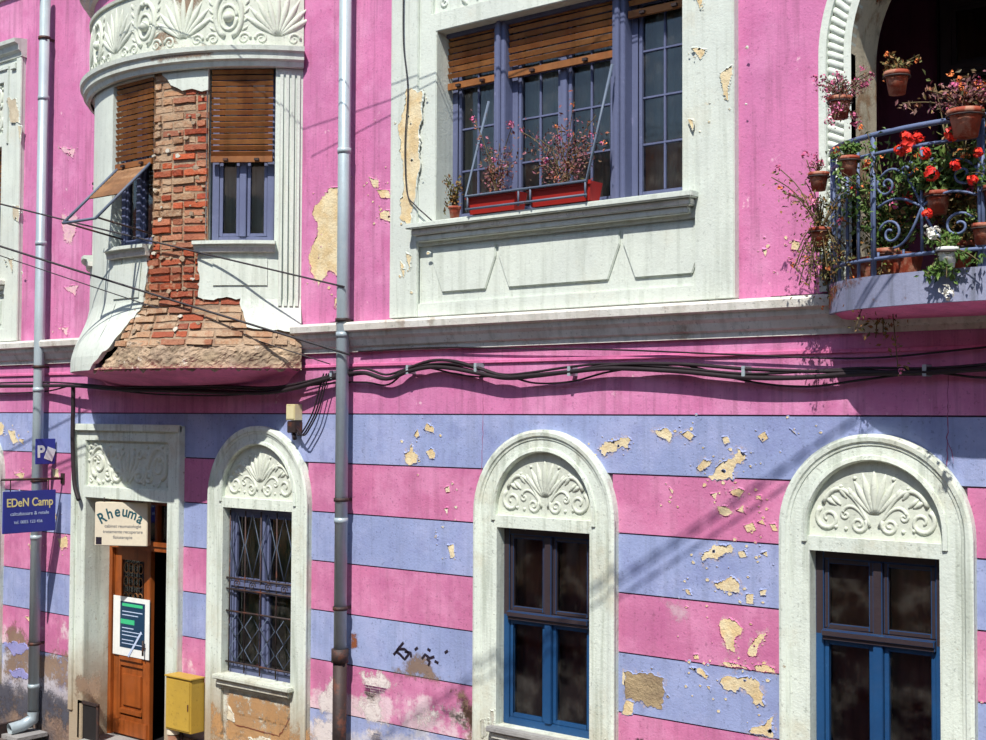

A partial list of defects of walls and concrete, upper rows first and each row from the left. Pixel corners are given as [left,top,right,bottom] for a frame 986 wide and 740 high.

peeling [363,87,427,226]
flaking render [93,71,302,374]
peeling [306,186,338,309]
peeling [400,417,443,477]
peeling [588,435,634,462]
peeling [654,413,778,605]
flaking render [226,693,290,740]
peeling [314,677,333,740]
flaking render [618,667,670,716]
peeling [684,604,776,739]